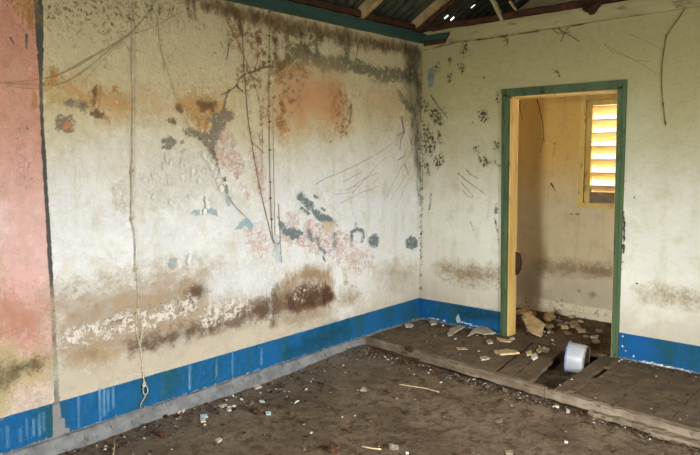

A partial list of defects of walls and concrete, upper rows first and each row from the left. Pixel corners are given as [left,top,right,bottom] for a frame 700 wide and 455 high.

water stain [39,0,175,38]
peeling [55,114,76,133]
peeling [161,108,245,207]
water stain [187,0,445,277]
peeling [25,0,70,437]
peeling [191,197,218,216]
peeling [279,192,379,272]
peeling [406,235,418,250]
water stain [441,264,501,282]
water stain [542,261,611,276]
water stain [0,265,334,414]